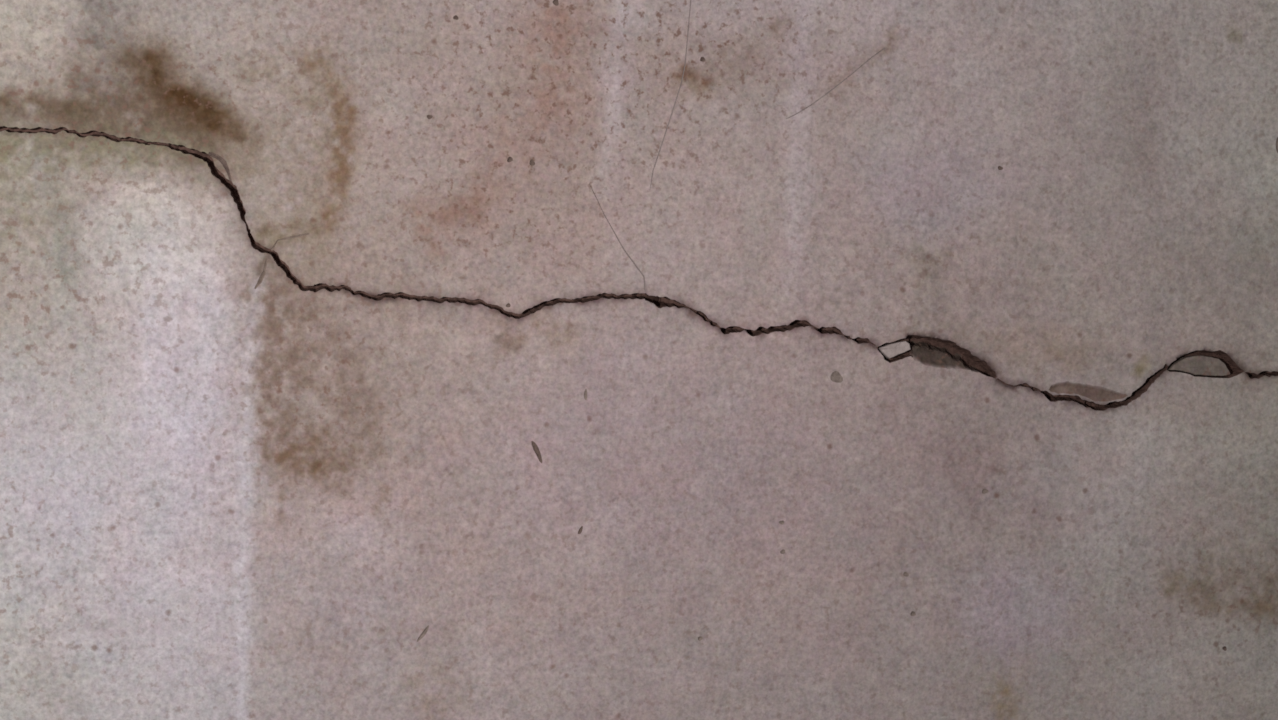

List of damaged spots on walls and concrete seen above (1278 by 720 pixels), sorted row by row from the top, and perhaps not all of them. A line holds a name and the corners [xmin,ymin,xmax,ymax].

damp [0,0,438,533]
crack [0,126,875,345]
spalling [876,335,996,378]
crack [997,350,1278,411]